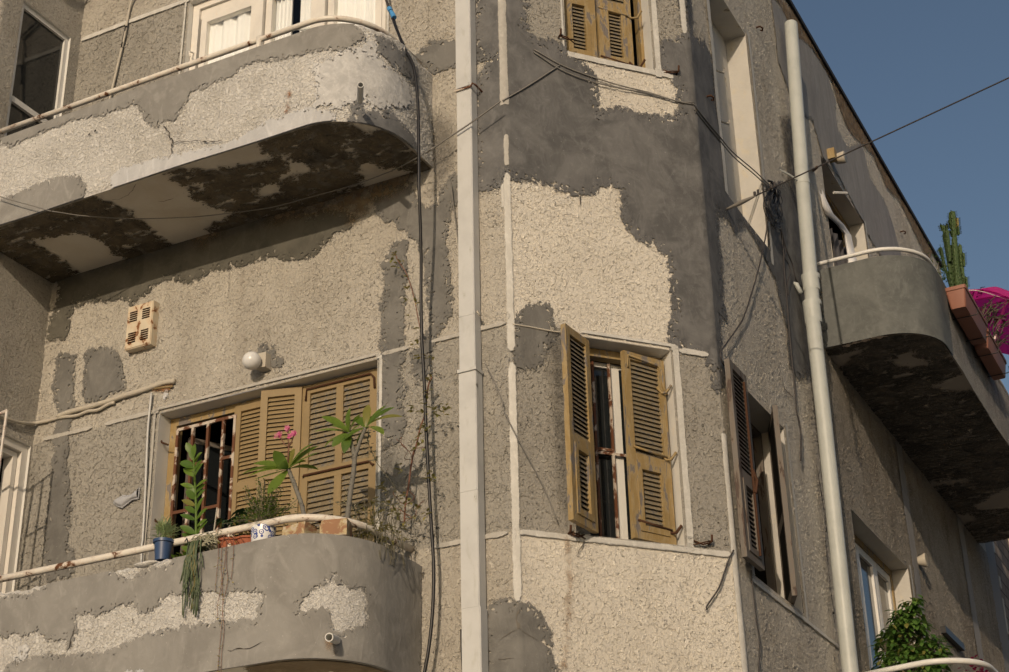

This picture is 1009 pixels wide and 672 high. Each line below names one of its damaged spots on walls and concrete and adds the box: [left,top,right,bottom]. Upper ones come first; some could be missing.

flaking render [109,38,431,233]
flaking render [0,196,172,283]
flaking render [826,335,1009,553]
flaking render [243,661,384,672]